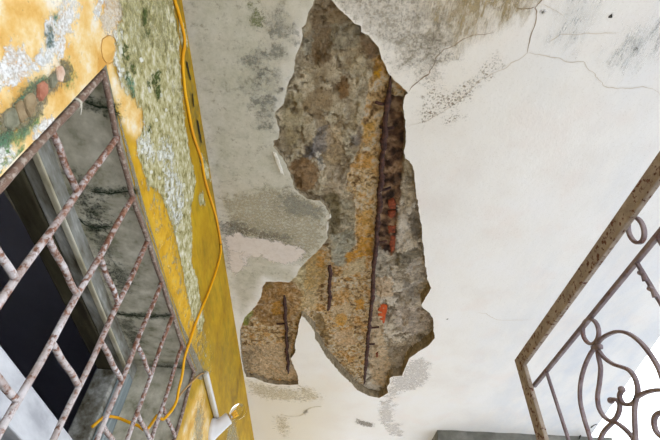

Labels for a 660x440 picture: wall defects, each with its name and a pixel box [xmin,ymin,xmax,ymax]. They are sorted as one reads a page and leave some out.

leakage [428,0,520,35]
mould [244,46,284,84]
crack [409,0,659,125]
mould [253,94,277,130]
mould [422,77,479,123]
spalling [223,0,435,398]